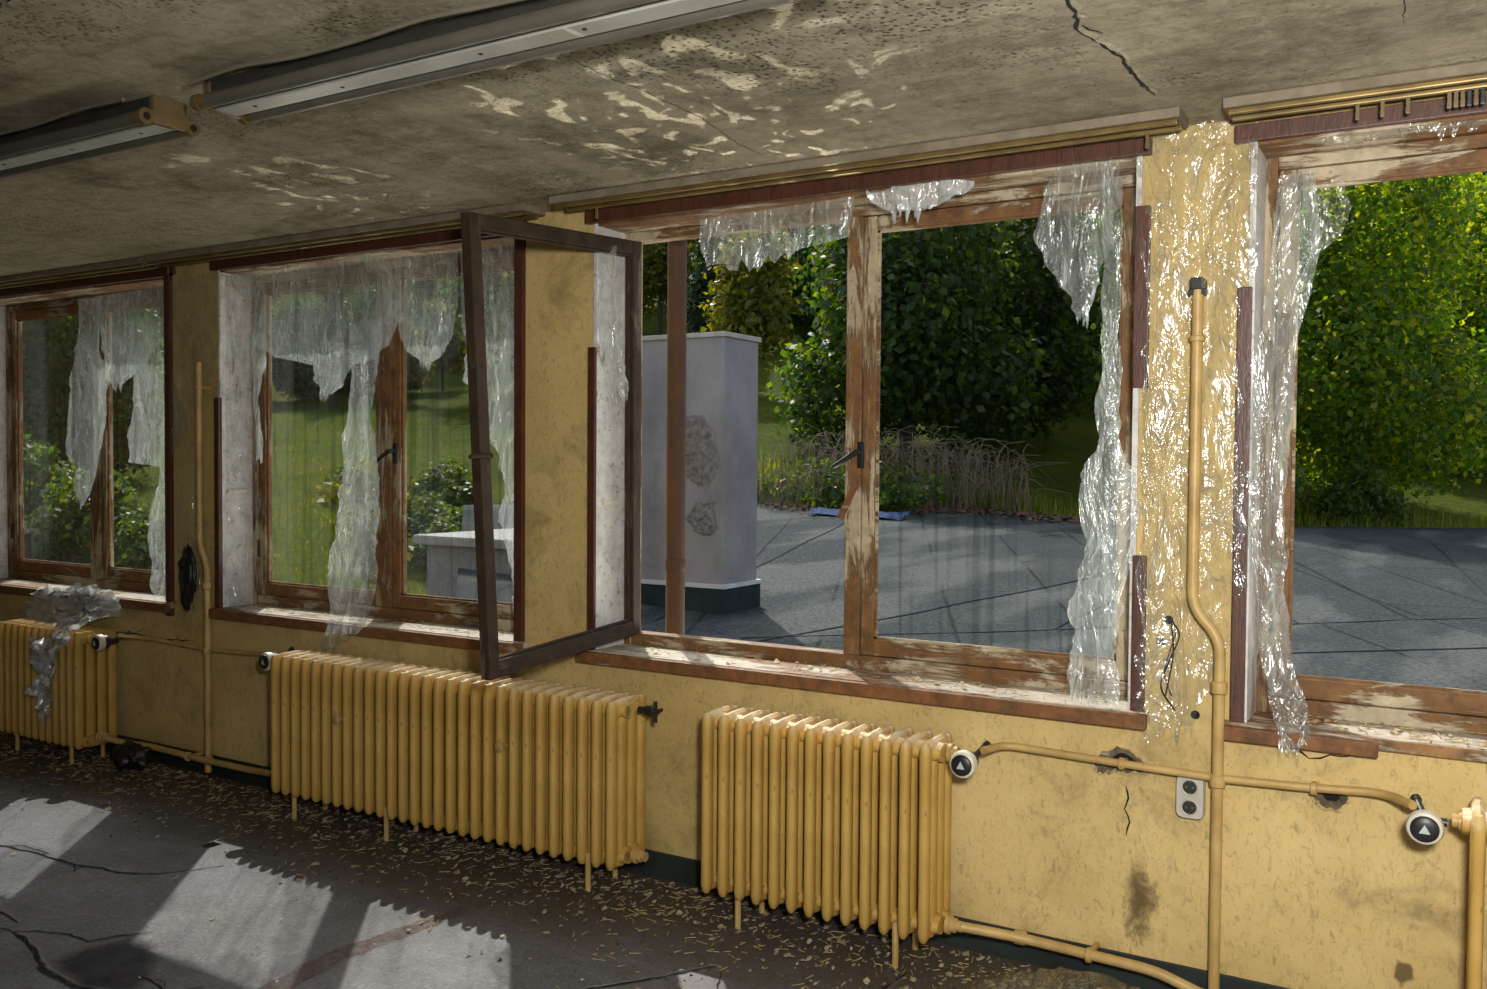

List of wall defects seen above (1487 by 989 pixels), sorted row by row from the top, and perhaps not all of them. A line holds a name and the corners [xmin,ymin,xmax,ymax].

crack [1065,0,1159,96]
crack [0,845,218,874]
damp [1131,874,1154,929]
crack [0,893,204,989]
crack [581,963,722,989]